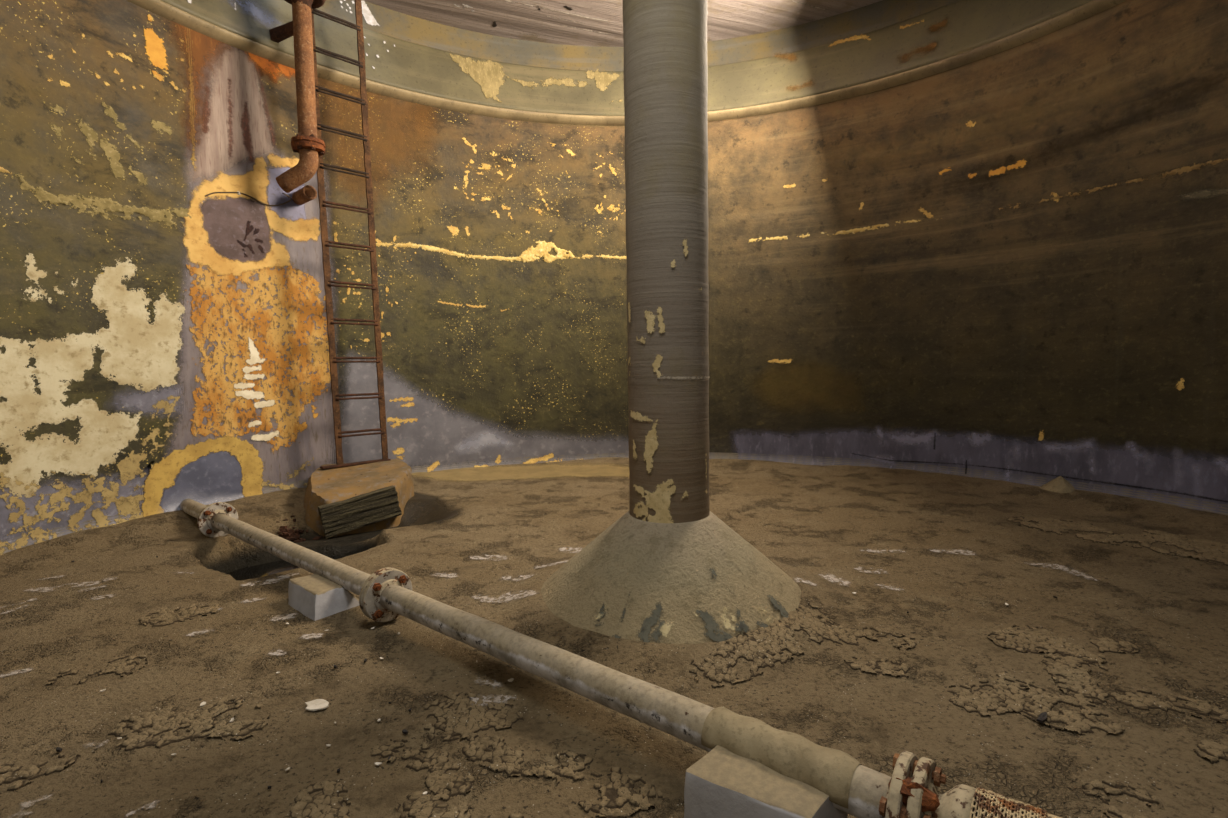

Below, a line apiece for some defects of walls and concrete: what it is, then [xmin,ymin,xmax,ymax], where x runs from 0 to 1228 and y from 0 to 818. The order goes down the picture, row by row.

rust [174,22,230,146]
leakage [188,44,291,212]
flaking render [267,167,307,221]
peeling [454,140,514,218]
peeling [450,54,622,102]
rust [142,51,331,517]
leakage [167,171,338,494]
peeling [0,253,186,553]
flaking render [160,451,244,512]
flaking render [332,354,688,523]
leakage [877,429,937,445]
flaking render [733,429,1228,514]